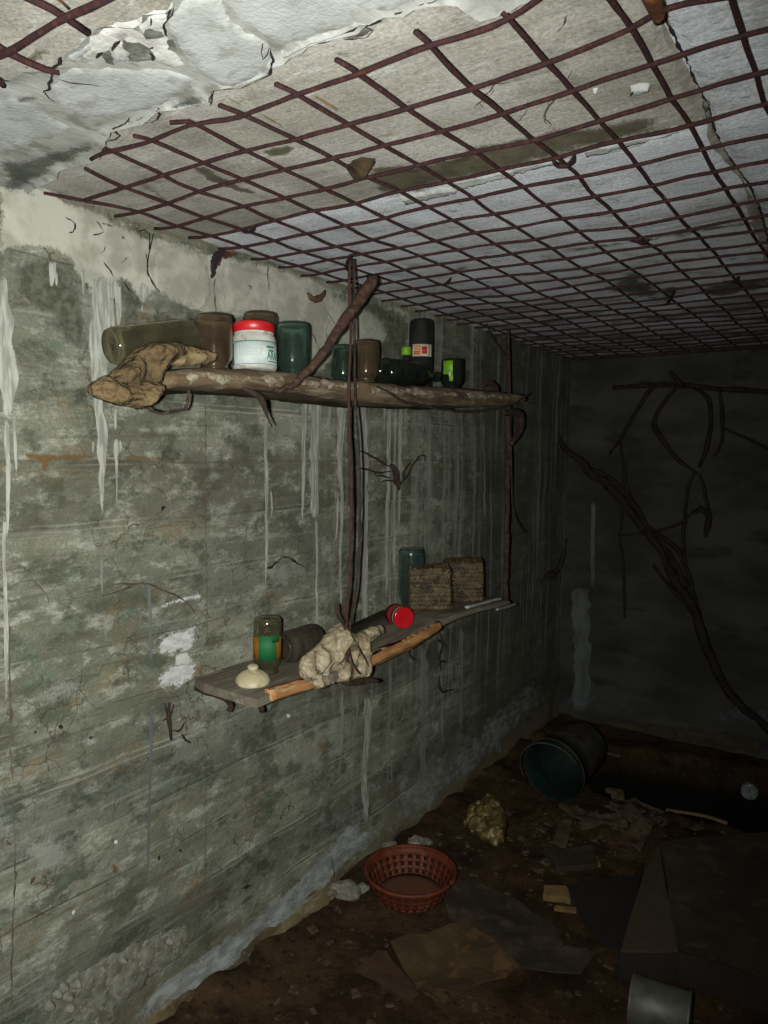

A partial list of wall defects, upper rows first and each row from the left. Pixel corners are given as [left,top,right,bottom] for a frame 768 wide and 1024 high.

spalling [0,0,768,374]
leakage [370,119,655,191]
leakage [0,275,19,700]
corrosion [27,455,92,471]
leakage [18,262,148,510]
crack [142,399,261,585]
leakage [264,415,273,591]
leakage [301,404,346,625]
leakage [360,407,369,618]
crack [2,571,122,1011]
leakage [137,695,373,1021]